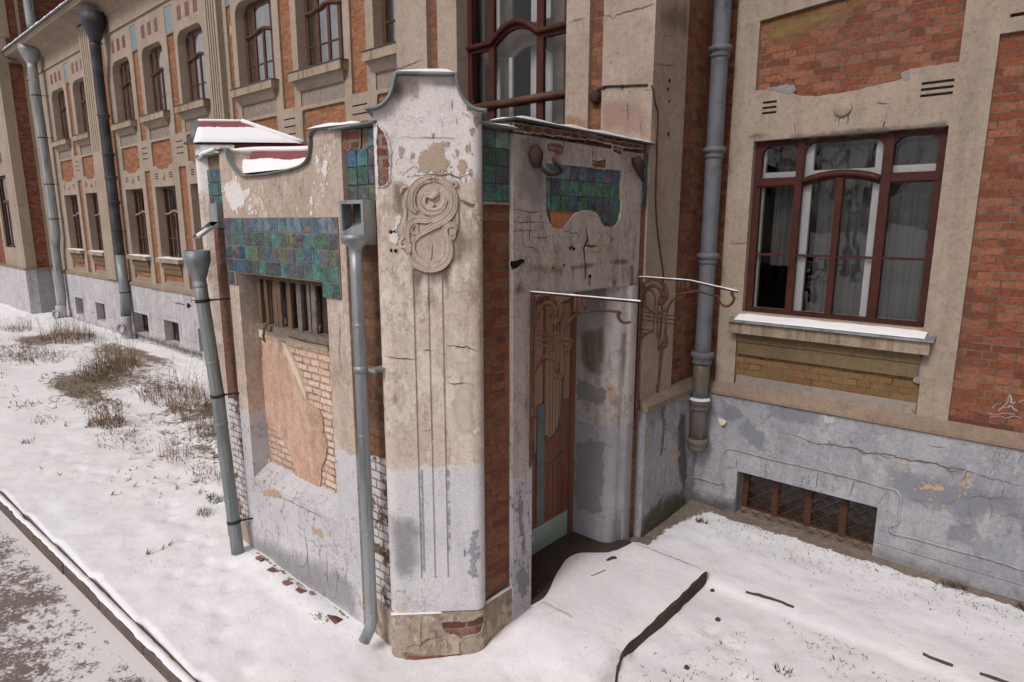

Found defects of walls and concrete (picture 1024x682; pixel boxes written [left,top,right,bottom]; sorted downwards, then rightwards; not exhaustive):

flaking render [374,101,481,189]
peeling [221,175,273,215]
crack [513,207,625,275]
leakage [582,331,602,372]
flaking render [258,329,330,487]
crack [782,432,1020,526]
peeling [890,461,972,514]
peeling [464,530,481,579]
flaking render [403,611,485,660]